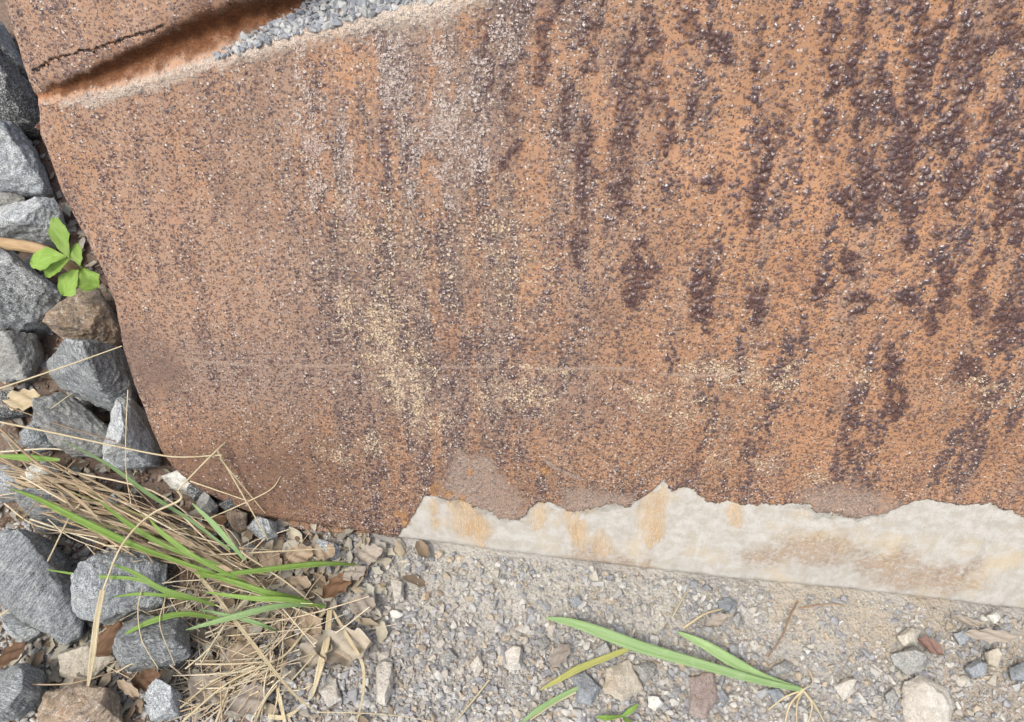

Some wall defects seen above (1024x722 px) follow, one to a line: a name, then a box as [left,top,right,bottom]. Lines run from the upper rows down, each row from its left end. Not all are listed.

crack [31,24,163,72]
rust [55,0,308,96]
spalling [395,479,1024,609]